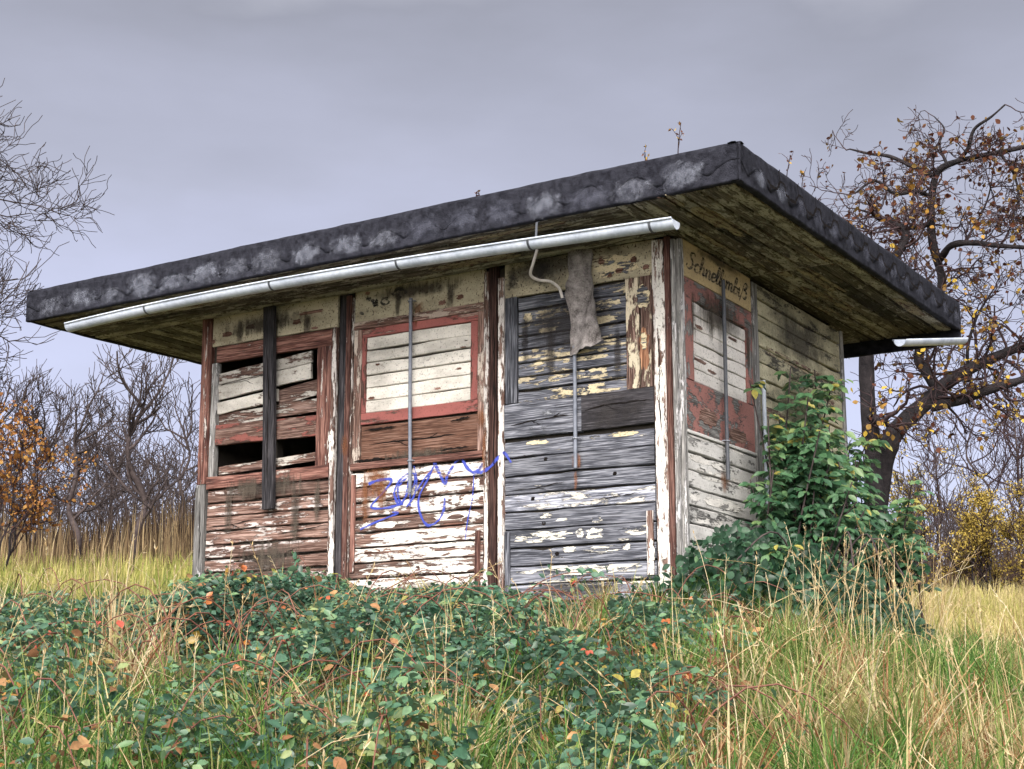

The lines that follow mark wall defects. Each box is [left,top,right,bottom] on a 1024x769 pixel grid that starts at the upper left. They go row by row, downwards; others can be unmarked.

peeling [523,309,557,333]
peeling [593,253,665,400]
peeling [549,338,616,398]
peeling [729,428,747,444]
peeling [243,504,323,527]
peeling [356,428,670,589]
peeling [210,538,334,578]